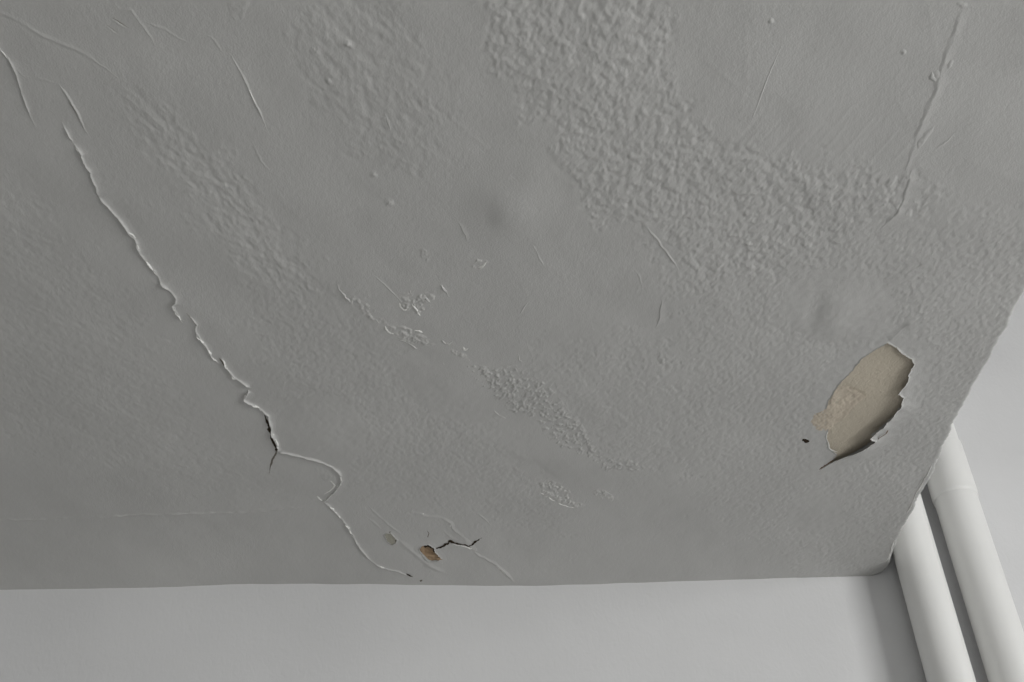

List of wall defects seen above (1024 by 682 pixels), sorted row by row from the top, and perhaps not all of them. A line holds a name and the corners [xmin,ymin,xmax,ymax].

crack [0,39,422,582]
peeling [797,314,938,482]
spalling [414,531,515,583]